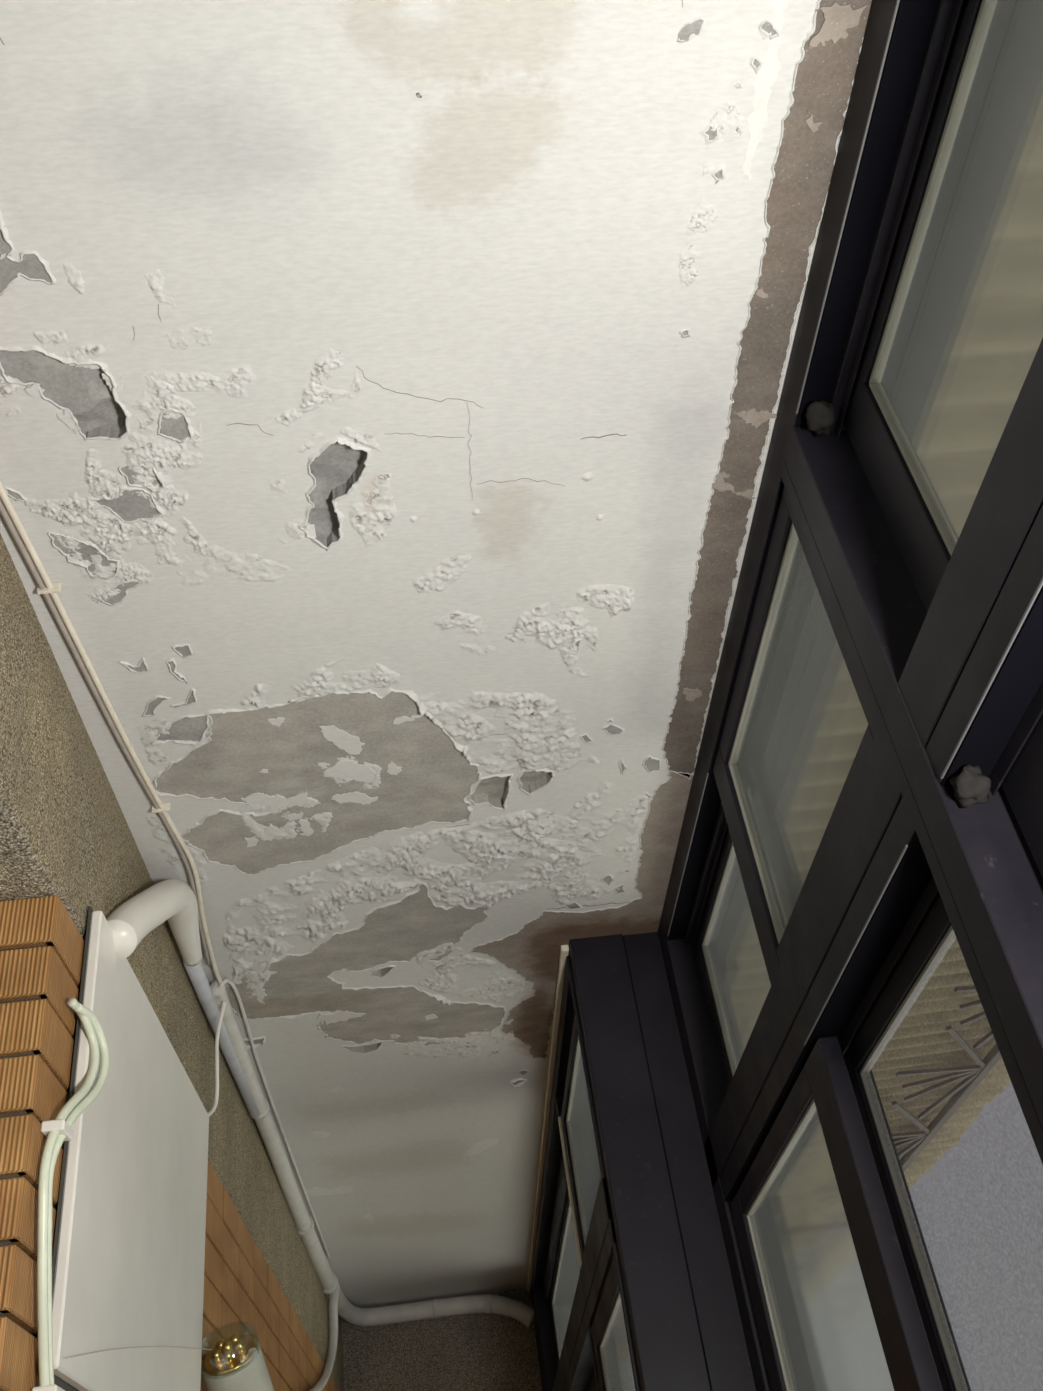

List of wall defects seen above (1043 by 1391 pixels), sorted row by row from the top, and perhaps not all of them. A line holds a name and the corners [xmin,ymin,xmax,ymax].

peeling [0,211,85,296]
spalling [0,330,257,606]
crack [356,366,563,497]
peeling [137,0,872,1088]
peeling [118,657,149,674]